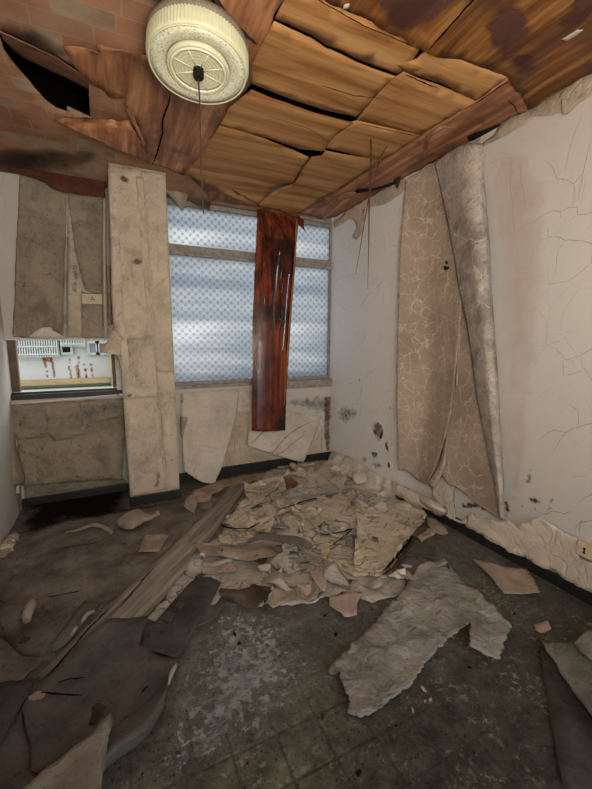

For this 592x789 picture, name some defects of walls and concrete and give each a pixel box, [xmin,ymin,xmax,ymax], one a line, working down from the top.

peeling [209,0,283,68]
leakage [380,0,453,29]
leakage [488,7,531,69]
peeling [63,44,260,207]
crack [152,92,171,164]
peeling [300,0,592,222]
crack [475,81,519,114]